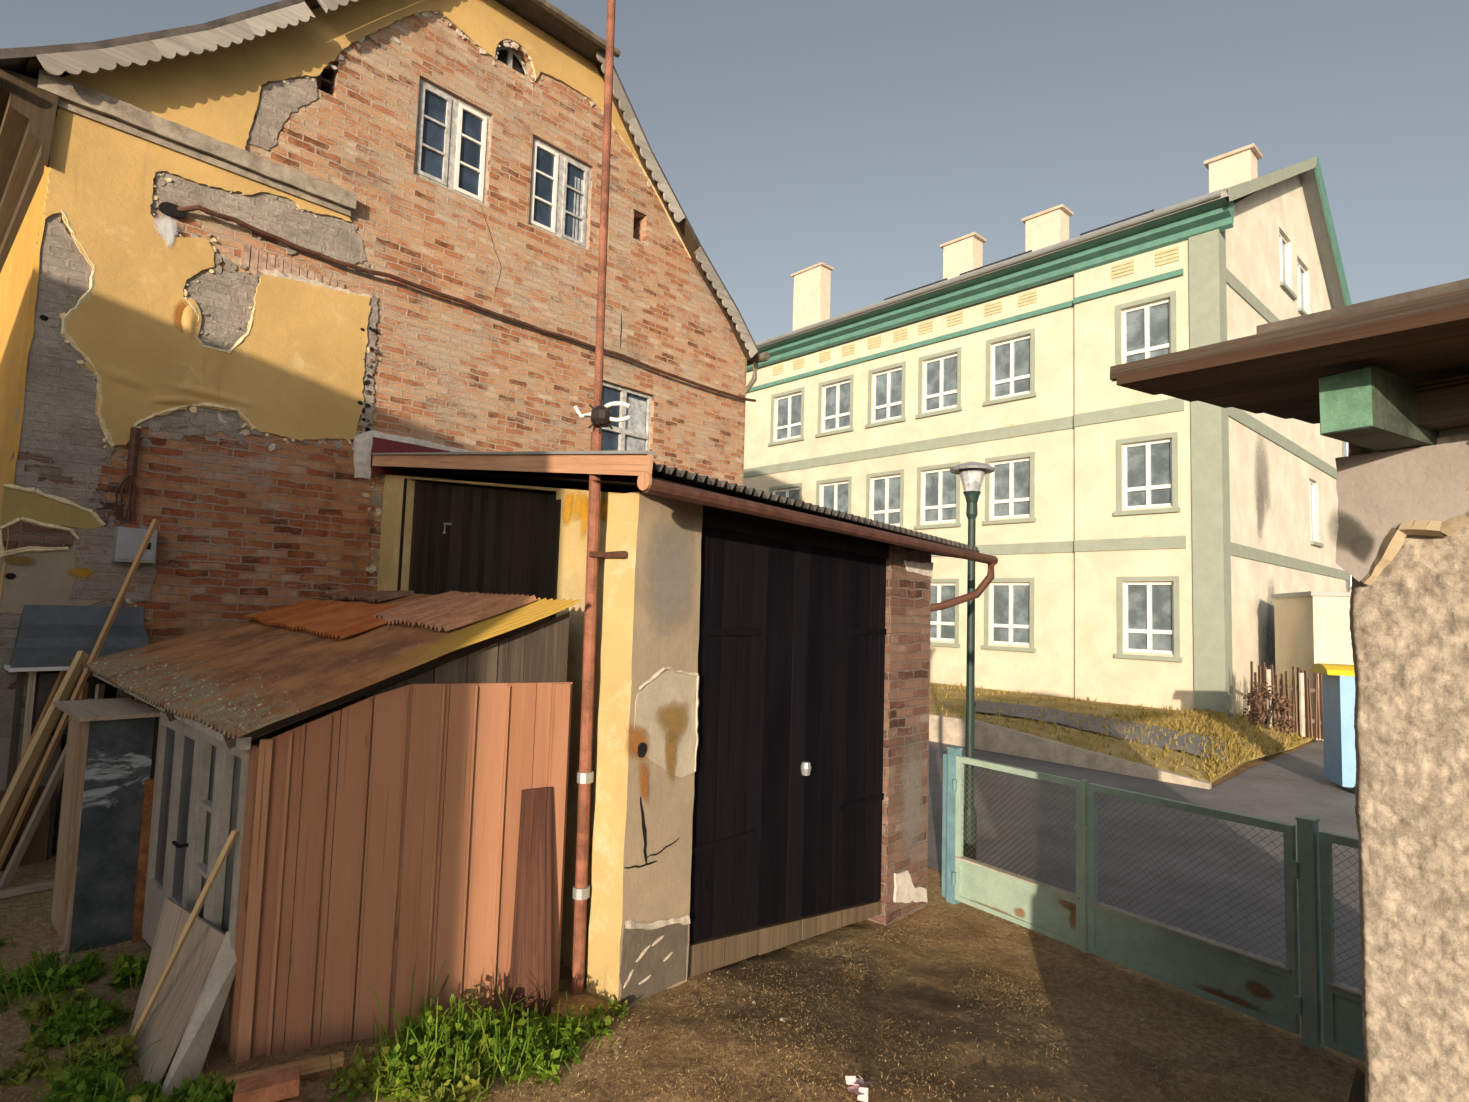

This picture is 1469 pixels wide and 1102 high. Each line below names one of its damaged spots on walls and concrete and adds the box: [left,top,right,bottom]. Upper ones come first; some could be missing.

flaking render [0,12,745,737]
peeling [1335,441,1469,585]
spalling [634,666,700,777]